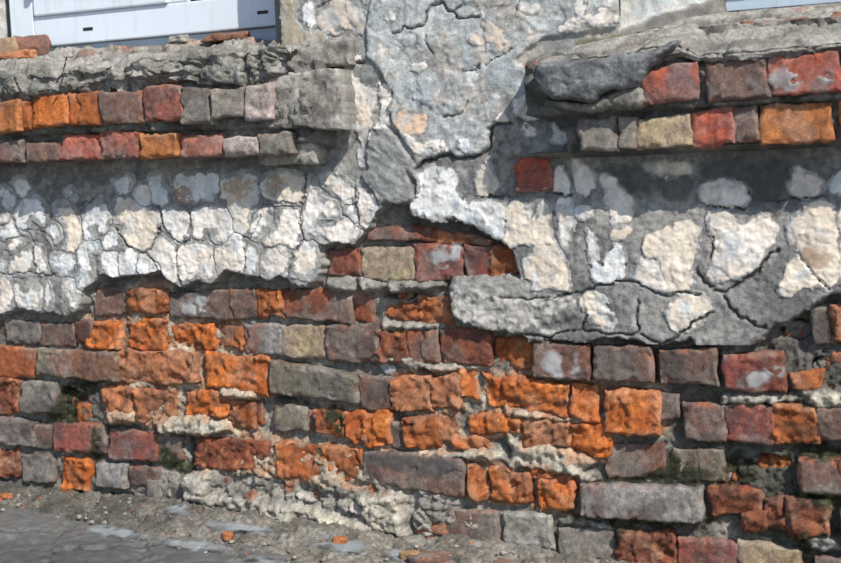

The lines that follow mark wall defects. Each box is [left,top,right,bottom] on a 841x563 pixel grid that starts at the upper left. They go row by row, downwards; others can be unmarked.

peeling [279,0,377,46]
crack [392,2,480,45]
peeling [556,0,620,33]
peeling [344,50,841,334]
peeling [0,164,664,481]
crack [524,250,779,345]
spalling [789,303,841,391]
spalling [750,402,822,472]
spalling [60,455,96,492]
spalling [466,462,579,512]
spalling [706,458,832,540]
spalling [613,526,678,563]